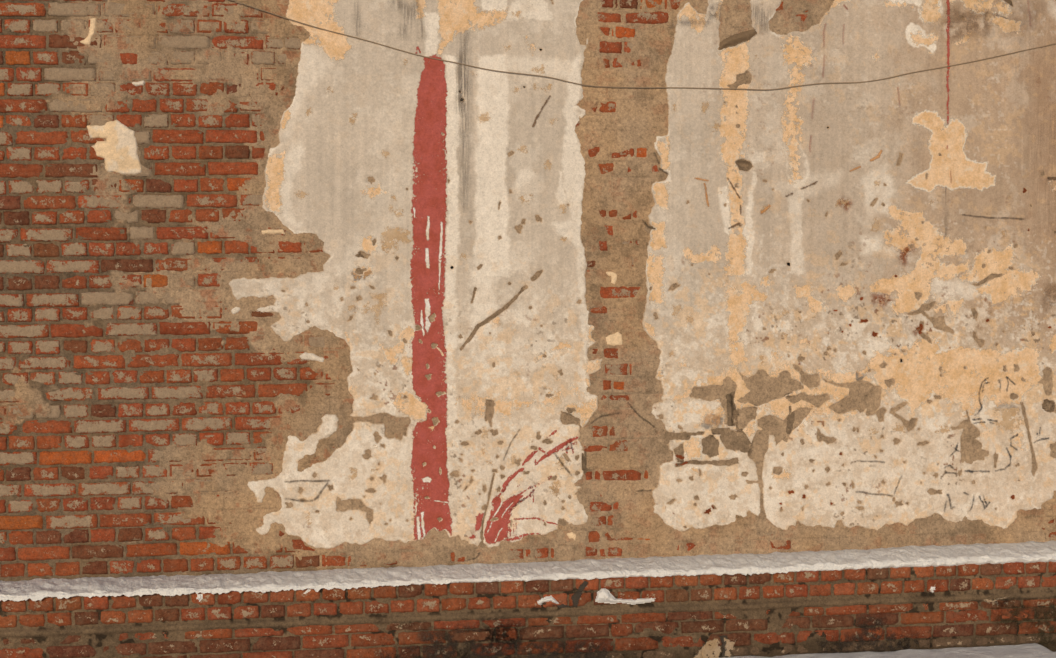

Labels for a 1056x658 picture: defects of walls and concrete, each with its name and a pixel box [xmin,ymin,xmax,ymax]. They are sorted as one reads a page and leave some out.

flaking render [156,0,1056,576]